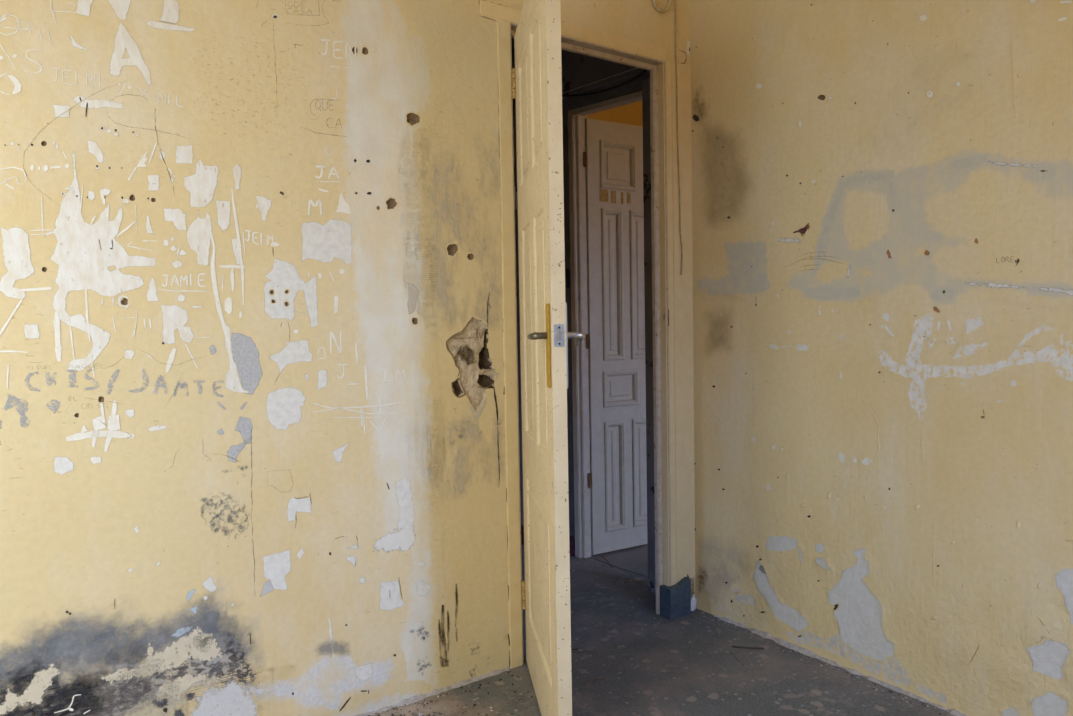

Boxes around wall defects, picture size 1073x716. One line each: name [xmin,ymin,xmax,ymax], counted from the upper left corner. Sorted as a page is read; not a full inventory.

damp [0,0,465,716]
spalling [210,325,262,463]
spalling [446,317,498,412]
peeling [753,536,895,662]
peeling [1055,568,1073,624]